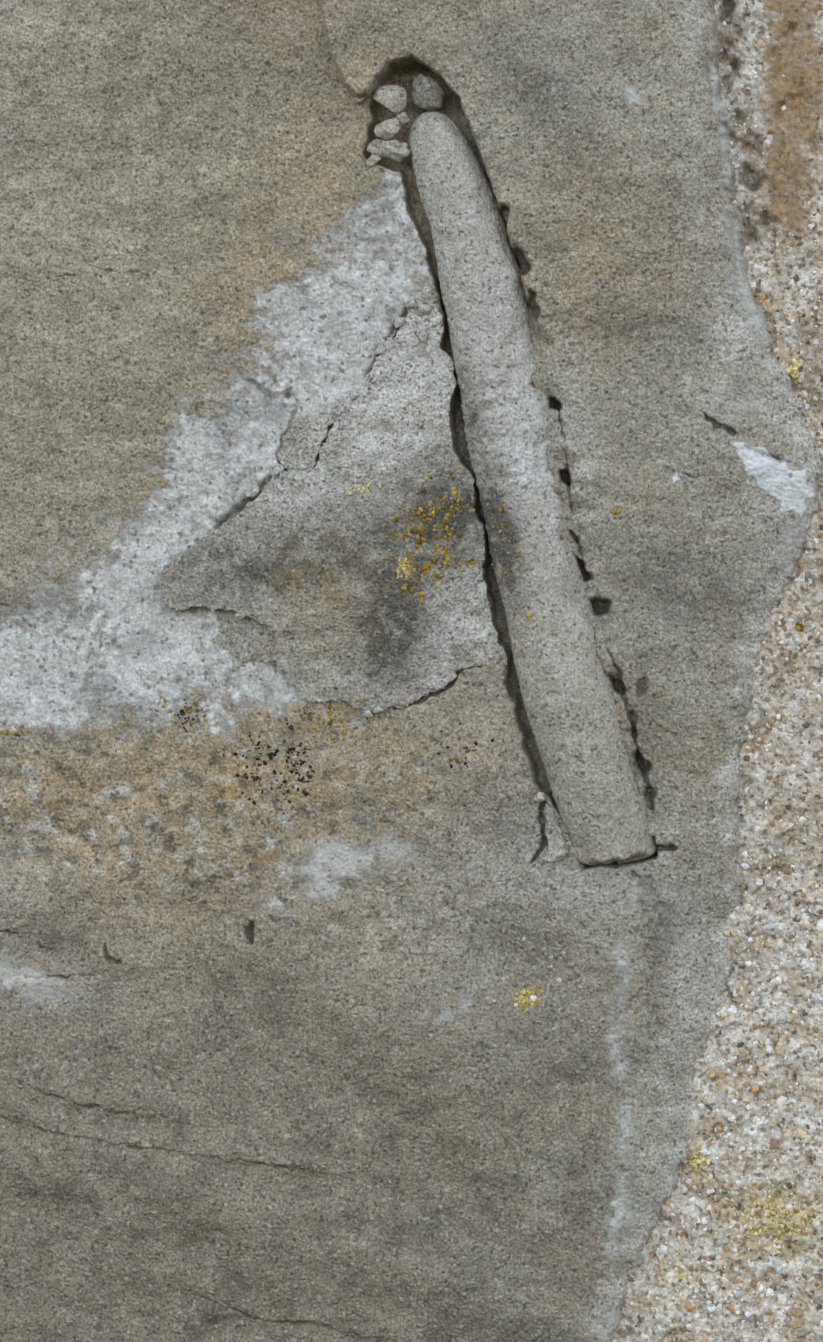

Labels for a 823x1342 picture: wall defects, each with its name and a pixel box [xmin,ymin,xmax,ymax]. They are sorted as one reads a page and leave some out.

peeling [0,169,507,736]
crack [395,666,481,709]
crack [43,1093,148,1114]
crack [2,1116,45,1132]
crack [243,1160,299,1168]